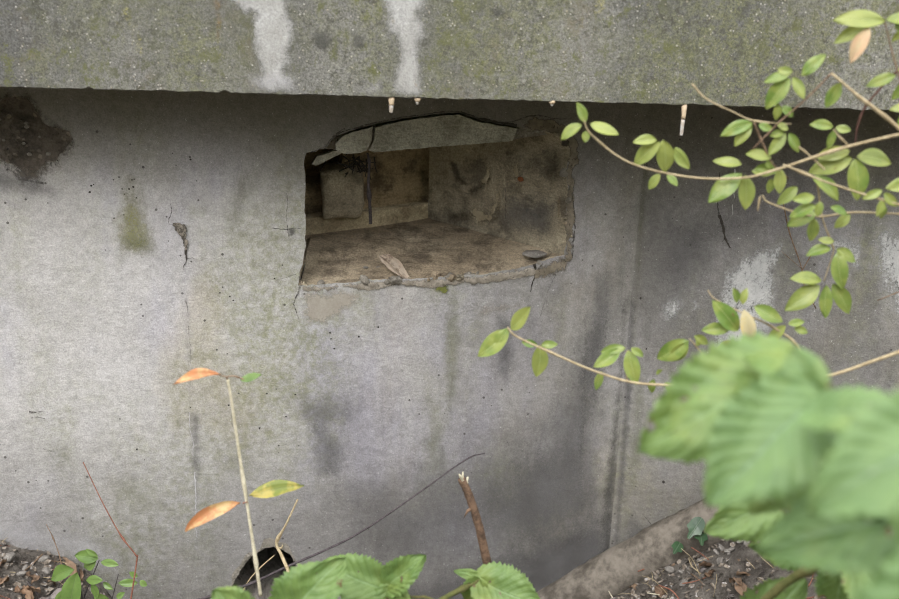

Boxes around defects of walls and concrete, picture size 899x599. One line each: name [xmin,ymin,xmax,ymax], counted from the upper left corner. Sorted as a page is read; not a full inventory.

leakage [234,0,292,90]
leakage [384,0,425,94]
spalling [0,94,73,180]
flaking render [303,113,579,292]
spalling [231,538,300,587]